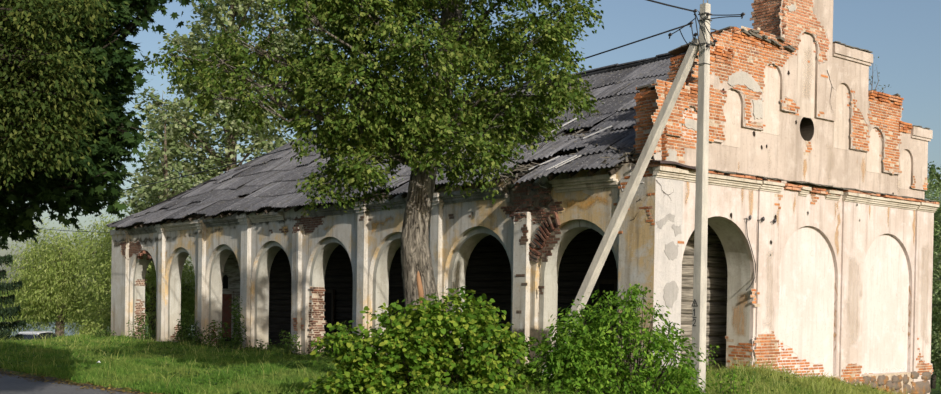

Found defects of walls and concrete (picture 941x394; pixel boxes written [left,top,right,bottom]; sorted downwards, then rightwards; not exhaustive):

flaking render [501,0,830,262]
flaking render [847,88,928,190]
flaking render [269,216,325,237]
flaking render [119,241,143,260]
peeling [663,281,679,308]
flaking render [133,299,148,337]
flaking render [292,287,328,354]
flaking render [725,331,825,378]
flaking render [841,362,873,383]